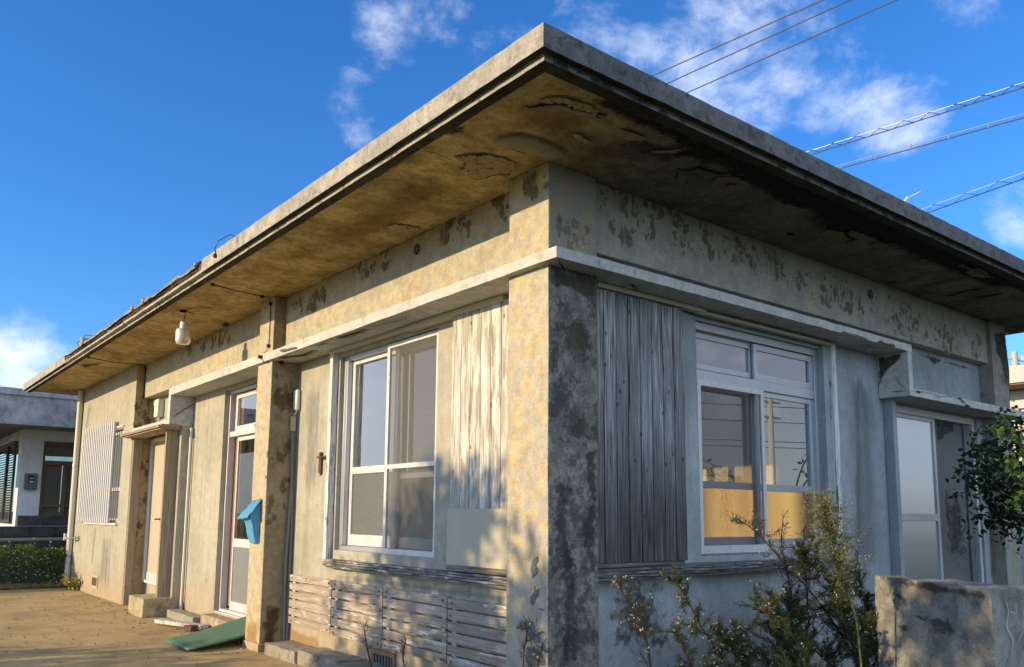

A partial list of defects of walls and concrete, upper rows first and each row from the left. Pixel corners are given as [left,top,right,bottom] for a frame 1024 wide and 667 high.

peeling [438,214,471,246]
peeling [522,170,550,201]
peeling [557,214,590,250]
peeling [599,186,982,358]
water stain [594,99,1024,292]
water stain [567,322,589,353]
water stain [584,449,597,570]
water stain [555,483,578,662]